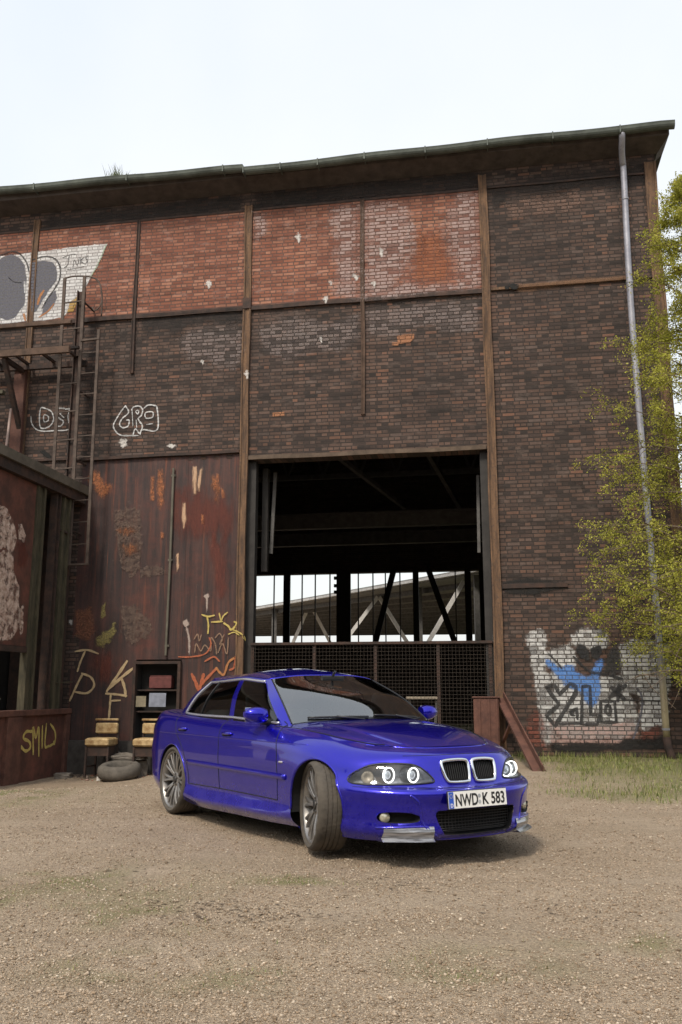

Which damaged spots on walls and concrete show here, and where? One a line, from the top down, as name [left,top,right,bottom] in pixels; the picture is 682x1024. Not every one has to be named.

rust [150,472,164,506]
rust [192,467,224,500]
peeling [0,505,26,641]
peeling [97,604,152,646]